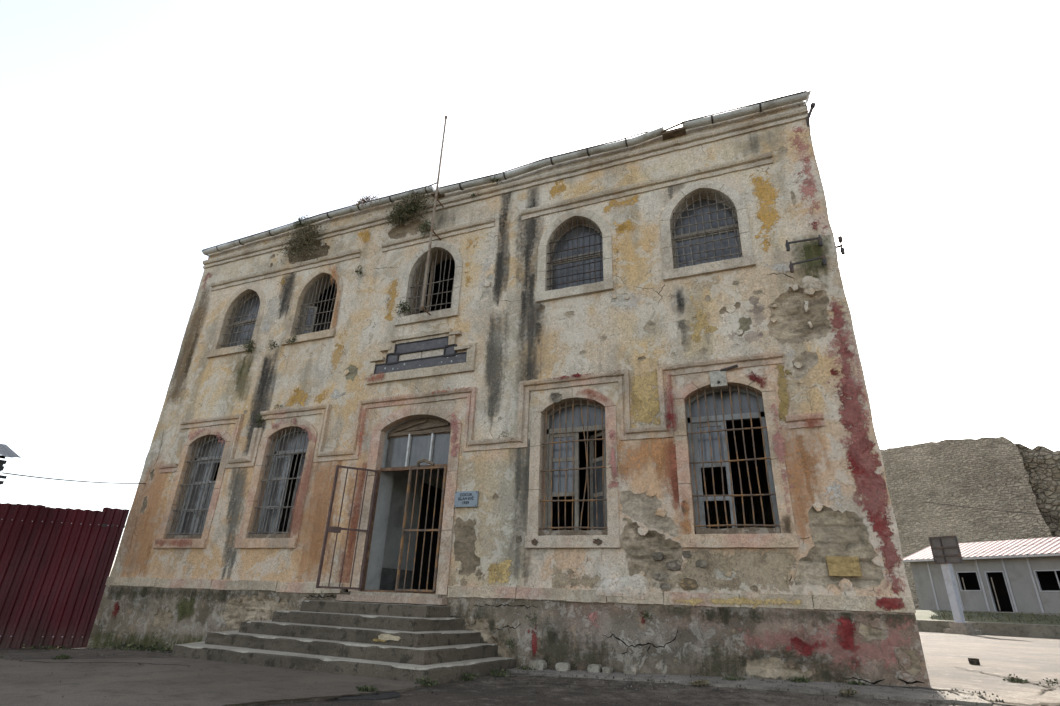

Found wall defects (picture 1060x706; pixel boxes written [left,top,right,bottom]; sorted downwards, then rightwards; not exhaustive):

water stain [493,189,542,381]
water stain [237,354,277,452]
water stain [487,316,507,419]
spalling [606,283,923,680]
spalling [449,516,512,586]
crack [604,627,679,654]